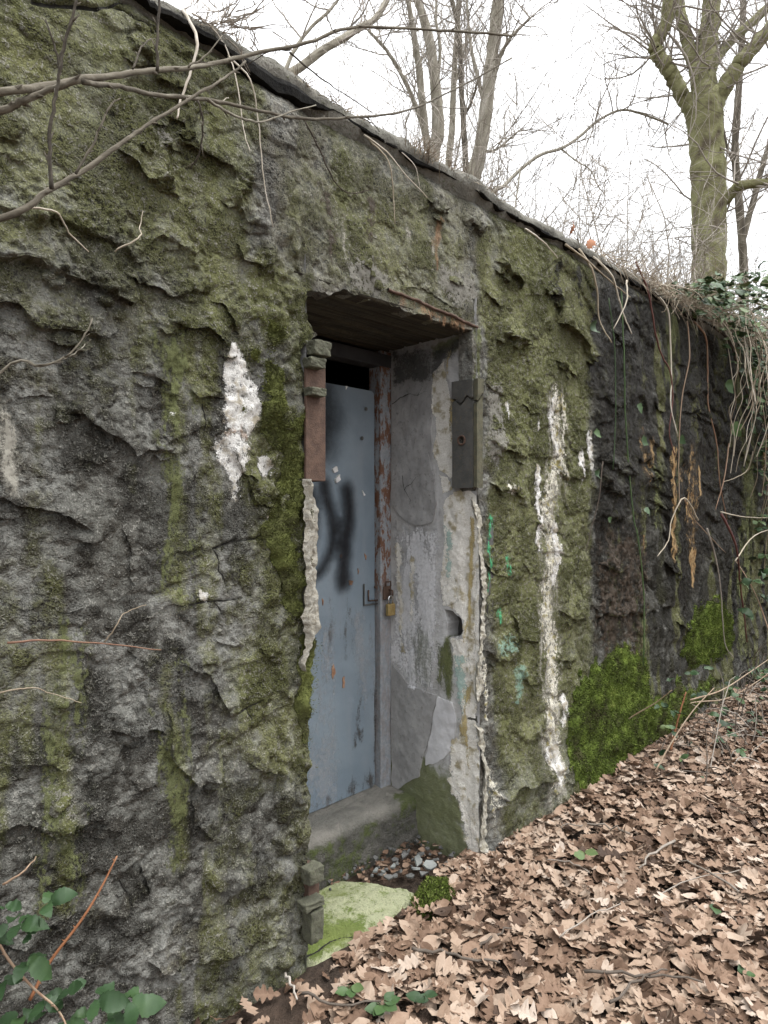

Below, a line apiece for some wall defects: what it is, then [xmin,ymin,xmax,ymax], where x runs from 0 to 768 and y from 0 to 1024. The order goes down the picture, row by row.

leakage [212,342,274,501]
peeling [302,496,321,635]
flaking render [391,349,579,789]
leakage [534,255,659,805]